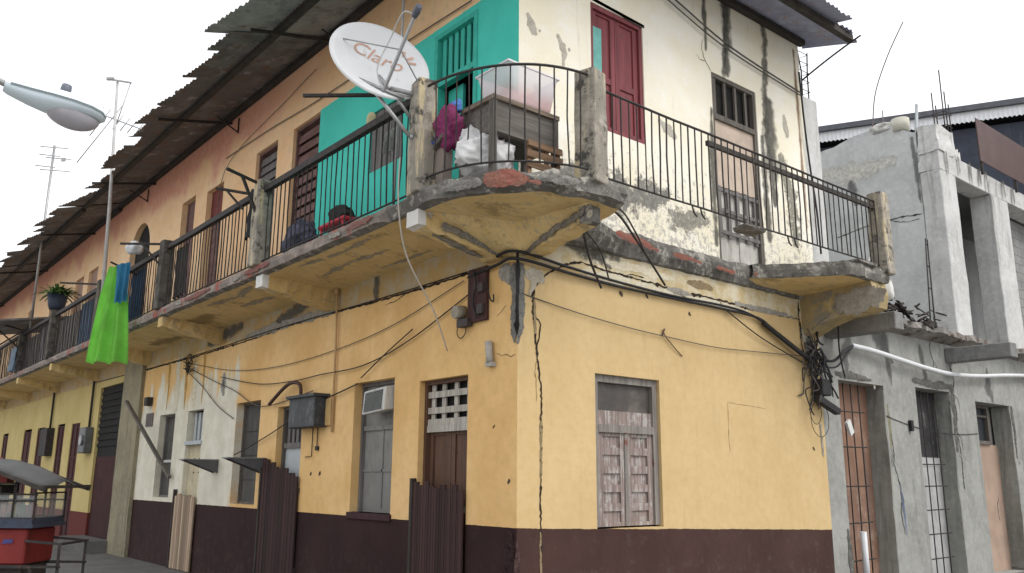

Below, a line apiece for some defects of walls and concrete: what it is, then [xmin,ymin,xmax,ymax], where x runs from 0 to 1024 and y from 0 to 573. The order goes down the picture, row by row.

peeling [526,12,541,35]
peeling [557,33,571,67]
damp [721,3,731,76]
damp [760,25,802,253]
flaking render [440,167,582,193]
spalling [427,209,593,345]
peeling [580,209,750,313]
peeling [833,284,887,316]
crack [496,261,804,573]